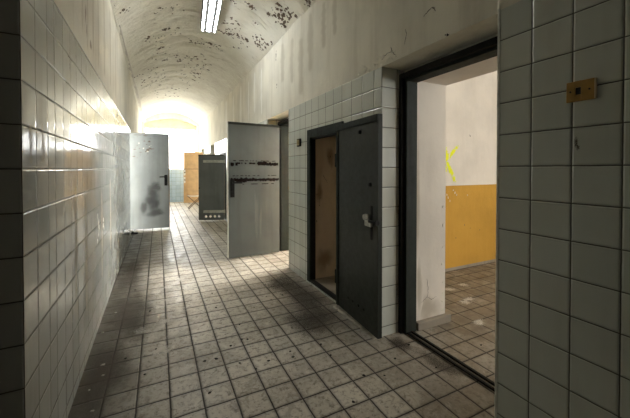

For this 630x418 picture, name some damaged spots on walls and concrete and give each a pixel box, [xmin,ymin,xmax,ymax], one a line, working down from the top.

peeling [267,2,298,28]
peeling [218,17,273,51]
leakage [279,0,339,98]